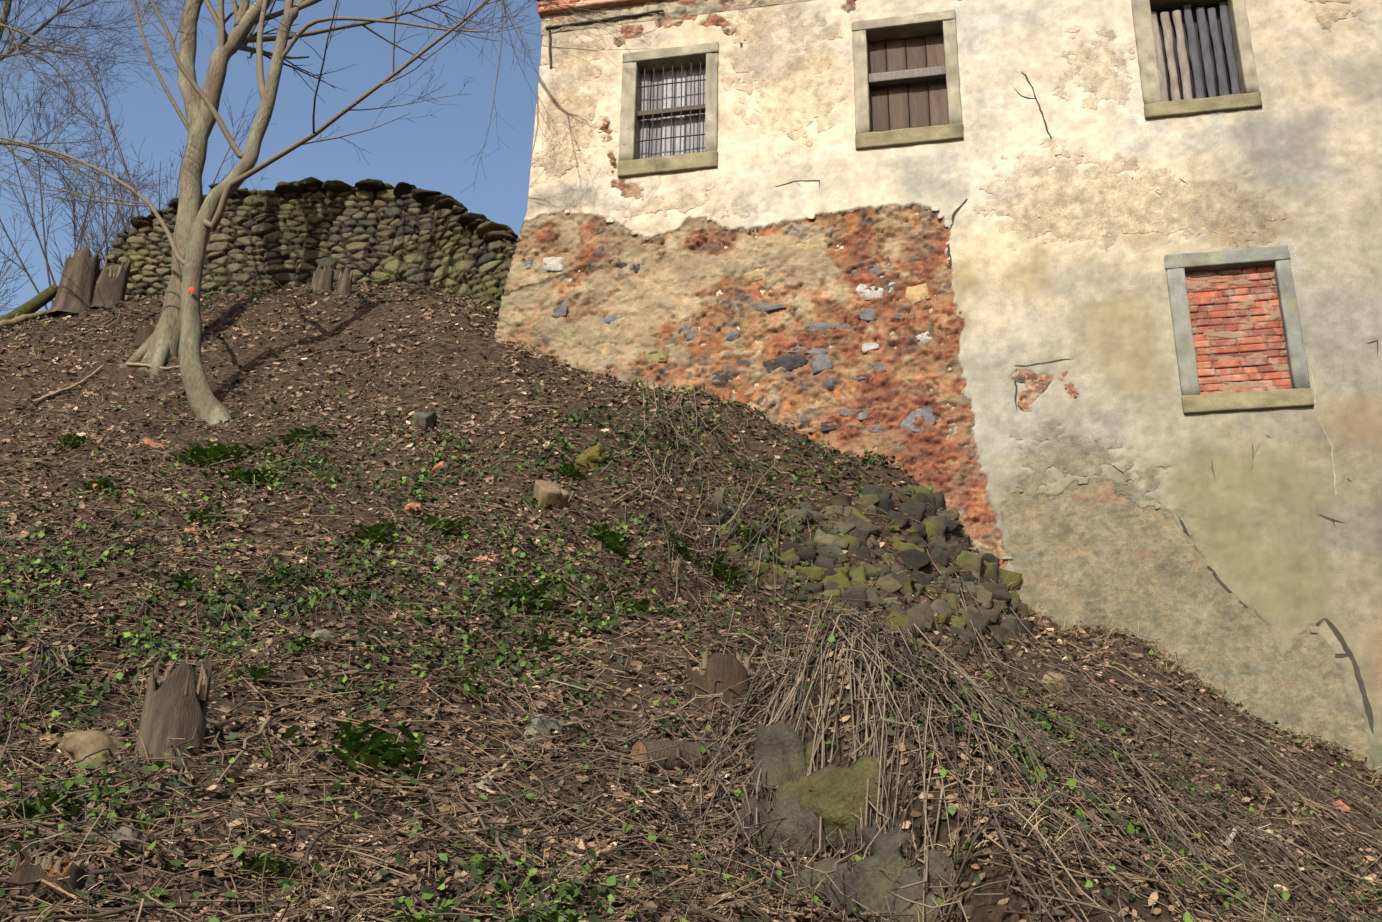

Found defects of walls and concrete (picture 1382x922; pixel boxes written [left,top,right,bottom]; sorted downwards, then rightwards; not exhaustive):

crack [1014,71,1057,157]
spalling [495,0,1374,773]
crack [1179,518,1248,608]
crack [1318,514,1344,527]